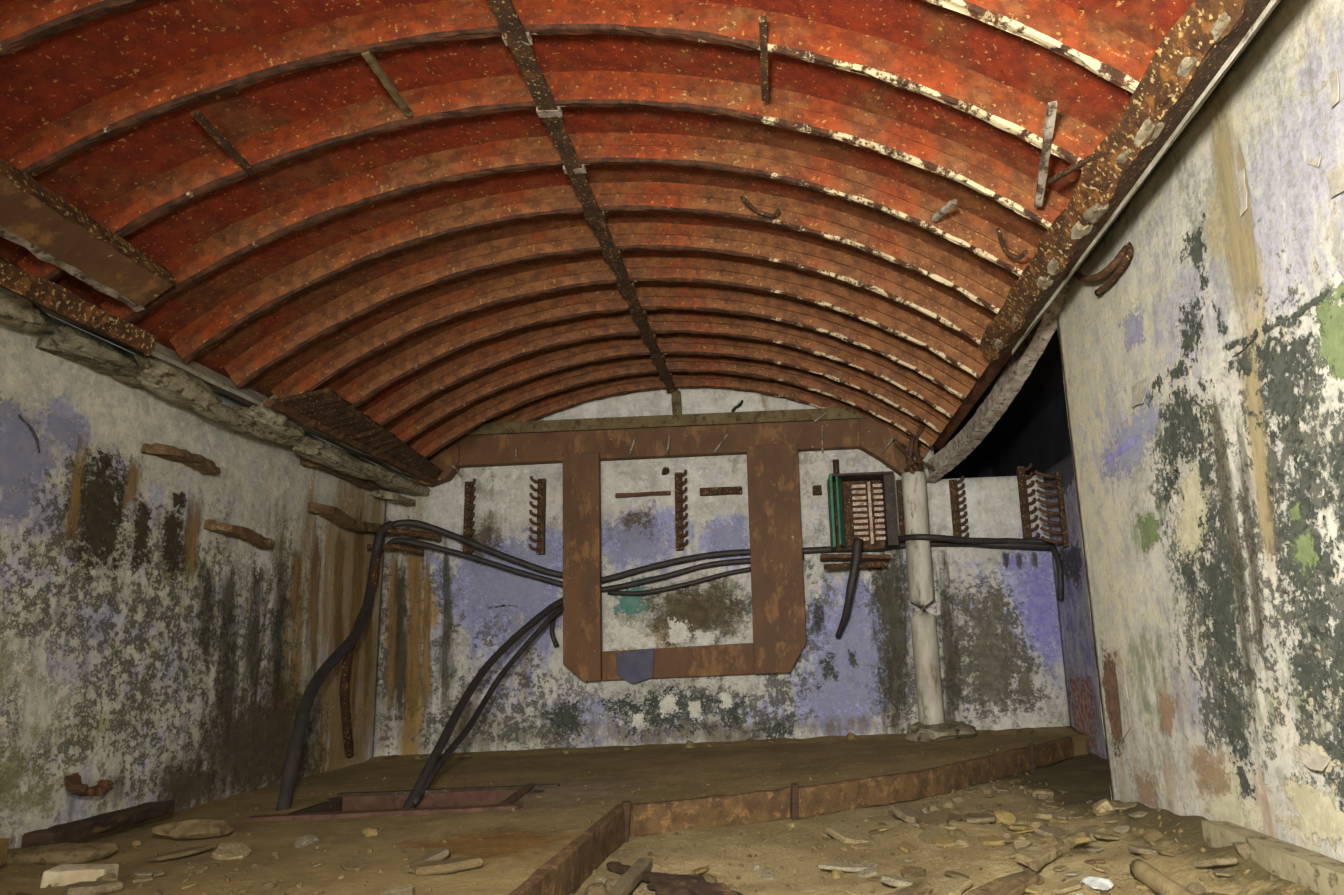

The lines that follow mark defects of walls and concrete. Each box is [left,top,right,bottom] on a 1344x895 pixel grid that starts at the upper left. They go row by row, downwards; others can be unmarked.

leakage [1213,118,1256,305]
leakage [59,445,188,590]
leakage [159,563,328,812]
corrosion [291,511,431,721]
leakage [395,570,406,716]
leakage [441,514,505,695]
leakage [621,507,655,542]
mould [539,680,799,745]
leakage [642,578,748,647]
leakage [814,646,860,700]
leakage [873,549,910,728]
leakage [1146,213,1344,812]